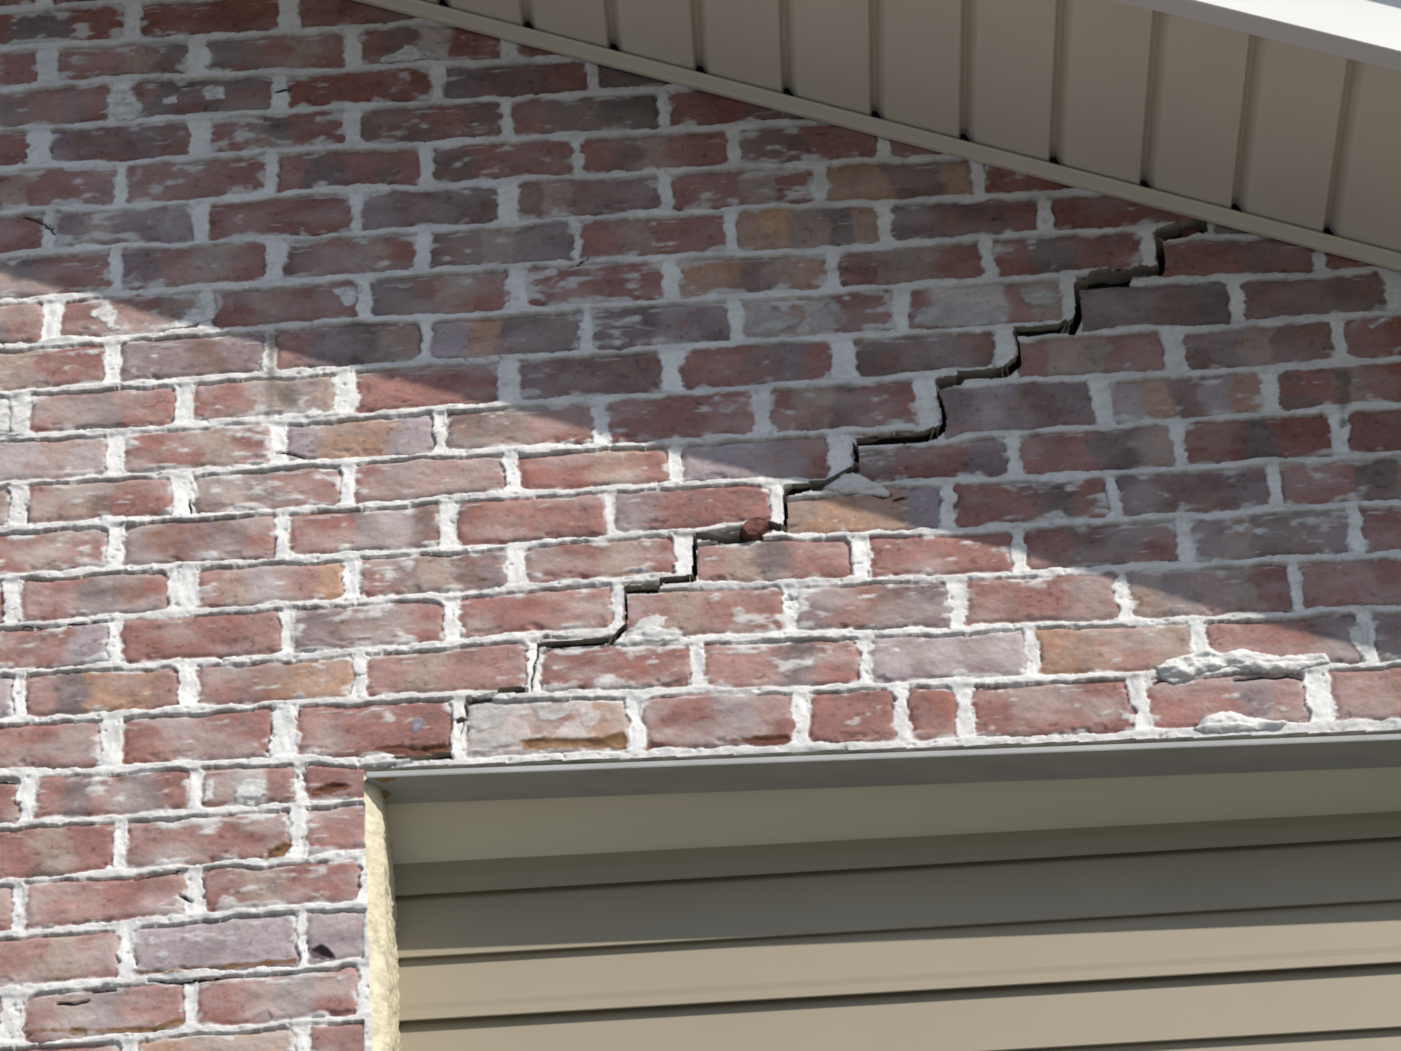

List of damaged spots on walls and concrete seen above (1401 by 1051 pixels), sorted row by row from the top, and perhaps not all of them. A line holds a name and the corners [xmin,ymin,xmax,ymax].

crack [391,218,1208,765]
crack [1234,675,1300,683]